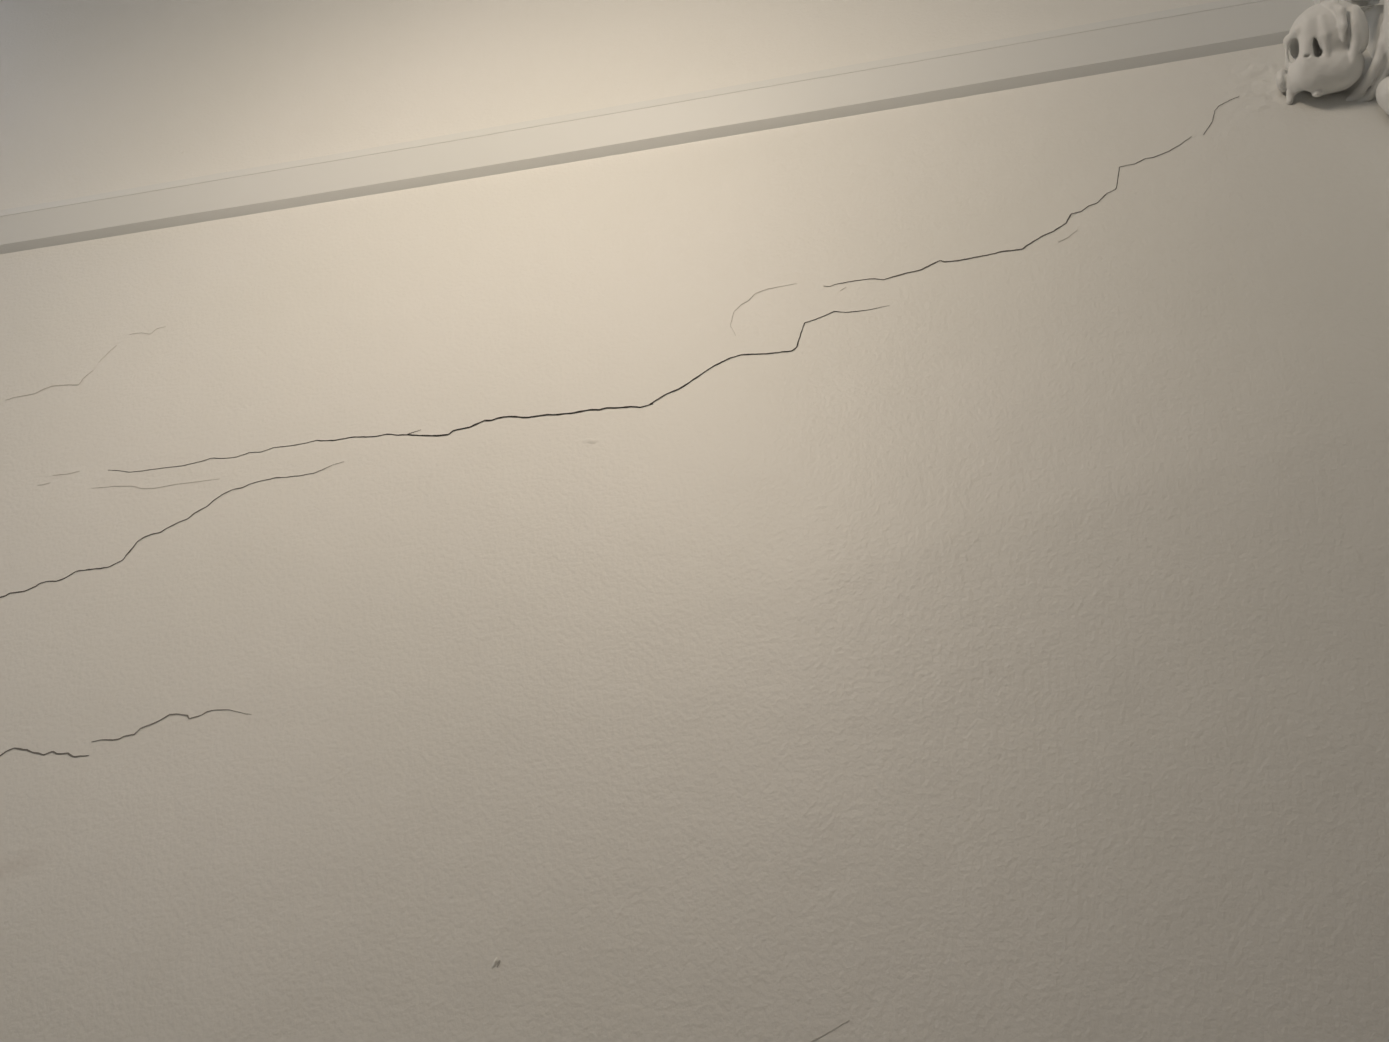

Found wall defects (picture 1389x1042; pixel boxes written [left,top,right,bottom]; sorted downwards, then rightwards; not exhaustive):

crack [0,96,1239,598]
crack [0,709,251,758]